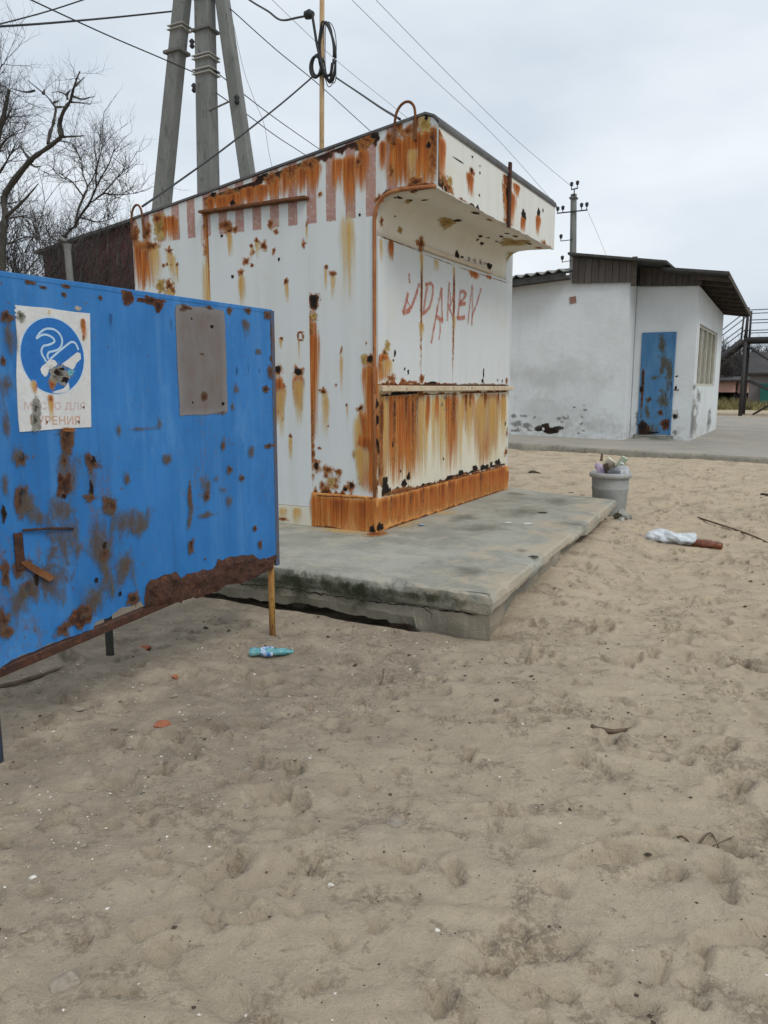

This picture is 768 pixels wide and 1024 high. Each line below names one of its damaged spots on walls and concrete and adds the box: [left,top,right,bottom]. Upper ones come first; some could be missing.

corrosion [202,115,446,301]
corrosion [459,167,520,237]
corrosion [121,213,178,313]
corrosion [380,237,506,361]
corrosion [0,310,15,395]
corrosion [256,311,509,537]
spalling [511,405,587,434]
corrosion [638,337,672,435]
corrosion [1,430,77,525]
corrosion [126,525,273,609]
corrosion [0,606,15,638]
corrosion [54,604,94,636]